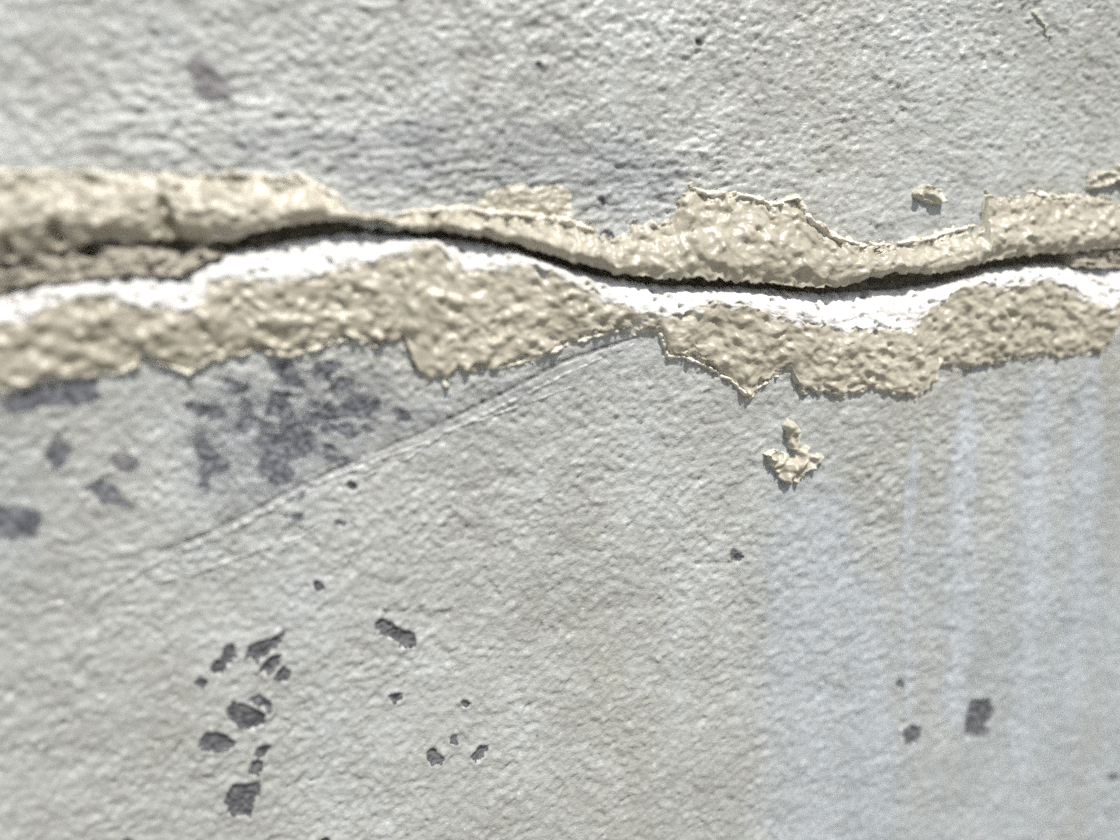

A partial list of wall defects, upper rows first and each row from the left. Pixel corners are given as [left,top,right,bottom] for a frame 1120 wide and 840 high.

peeling [1085,163,1120,190]
peeling [911,184,949,205]
crack [0,220,1120,336]
peeling [762,418,824,485]
spalling [729,549,744,562]